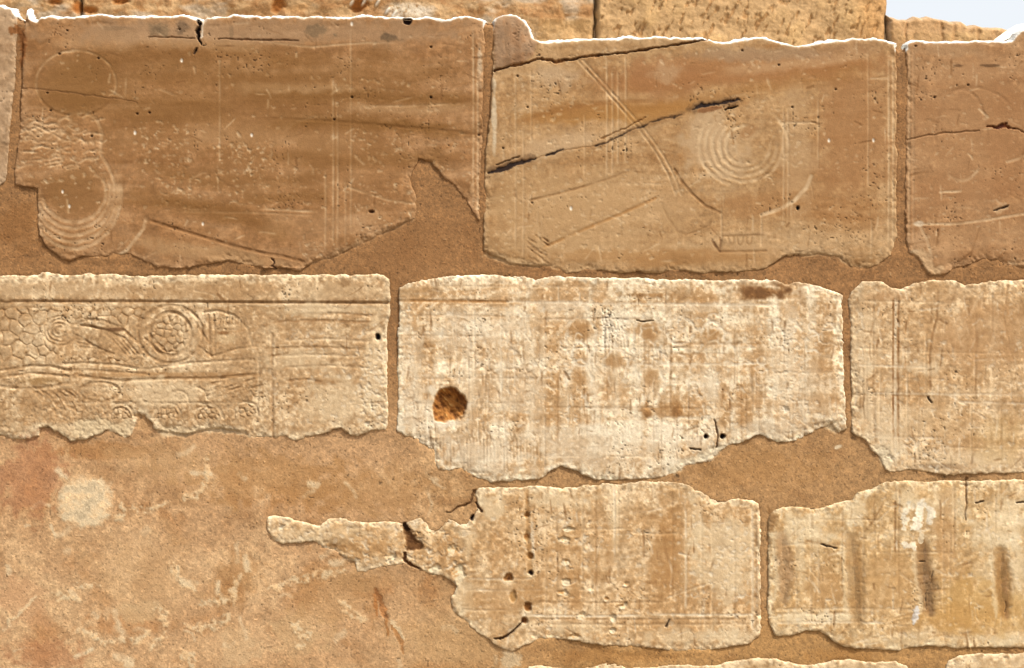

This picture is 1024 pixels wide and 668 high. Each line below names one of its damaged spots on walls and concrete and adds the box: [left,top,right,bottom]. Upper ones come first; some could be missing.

crack [147,19,299,55]
crack [492,39,709,73]
crack [486,94,743,175]
crack [906,130,980,142]
spalling [306,215,416,266]
spalling [668,444,726,477]
crack [445,488,483,521]
spalling [399,522,425,570]
water stain [842,529,868,630]
water stain [900,498,941,626]
water stain [991,543,1015,623]